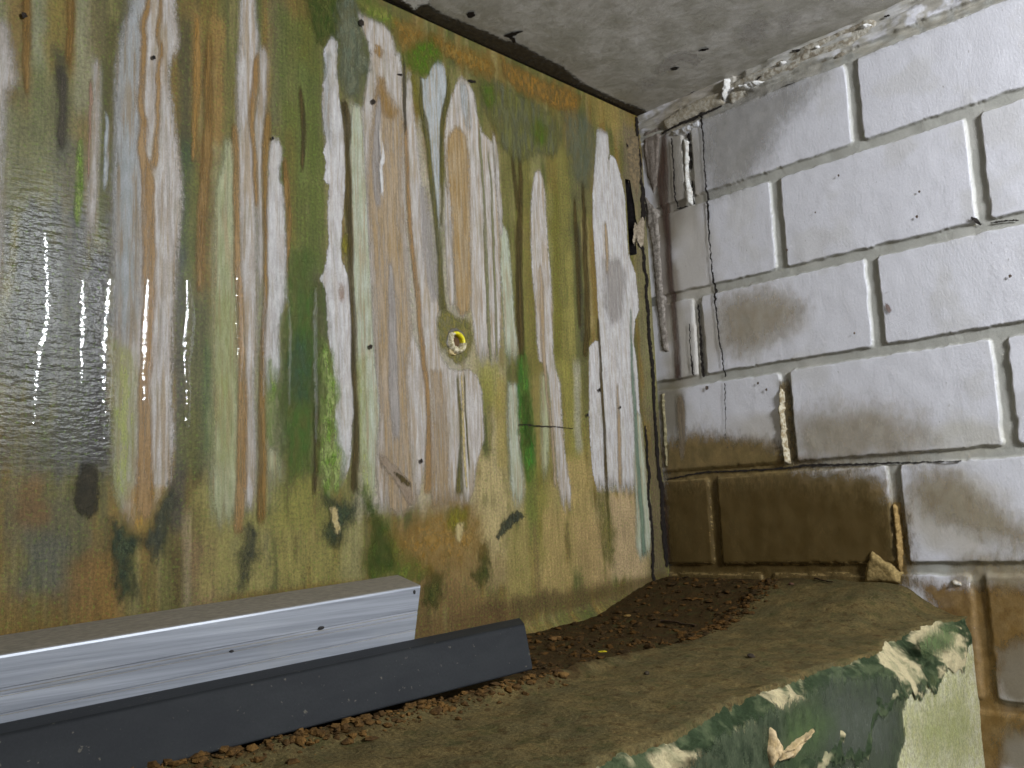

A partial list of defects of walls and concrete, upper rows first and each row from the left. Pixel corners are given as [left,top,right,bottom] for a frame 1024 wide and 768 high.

damp [0,22,16,274]
damp [74,0,183,529]
damp [210,0,287,532]
damp [319,14,517,513]
damp [383,0,646,116]
damp [507,384,524,502]
damp [530,171,571,507]
damp [589,130,652,556]
peeling [672,120,700,207]
damp [661,432,914,587]
crack [627,91,961,581]
peeling [722,19,877,104]